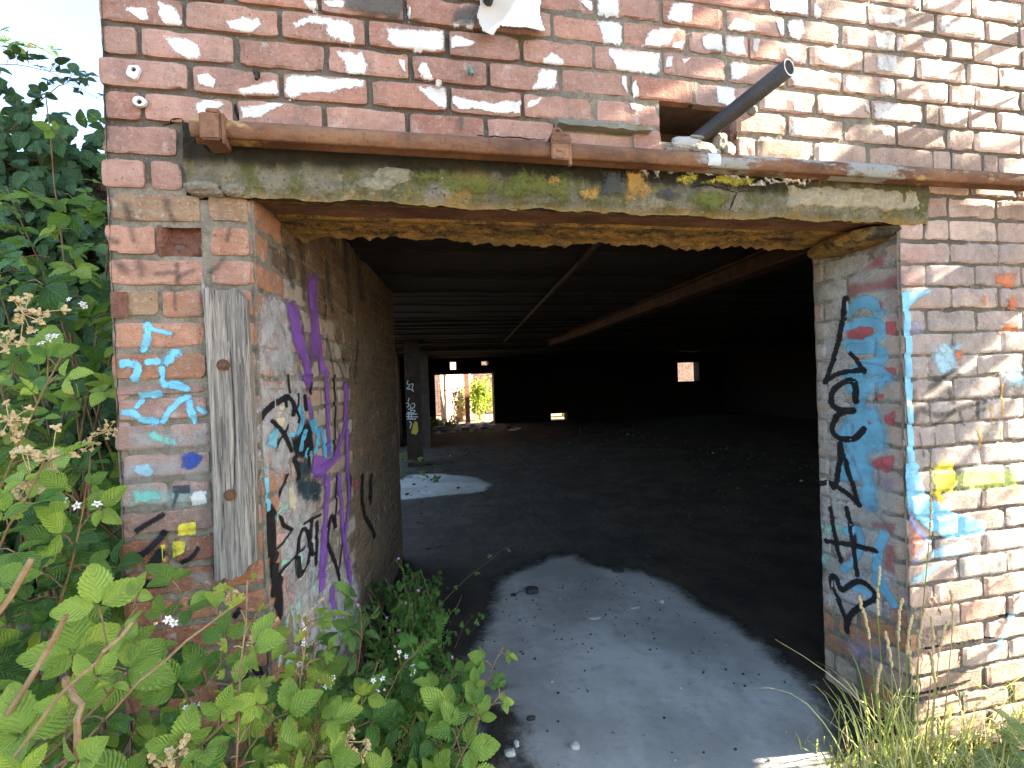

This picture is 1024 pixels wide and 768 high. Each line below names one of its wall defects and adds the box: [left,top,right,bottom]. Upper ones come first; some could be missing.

corrosion [625,171,655,203]